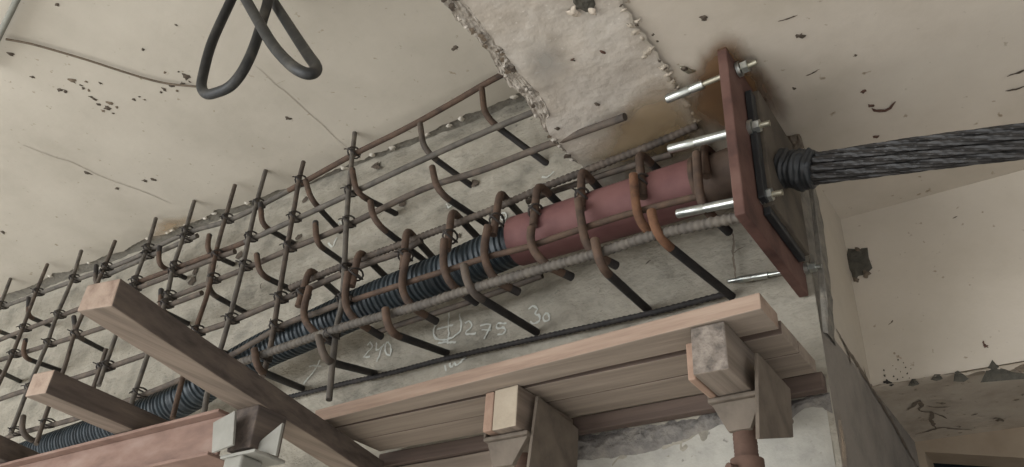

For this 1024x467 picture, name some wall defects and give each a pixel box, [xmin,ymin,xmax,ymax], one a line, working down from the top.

spalling [565,0,597,17]
corrosion [693,45,777,130]
spalling [0,0,583,304]
spalling [847,247,872,282]
crack [837,330,1004,467]
spalling [872,360,1024,392]